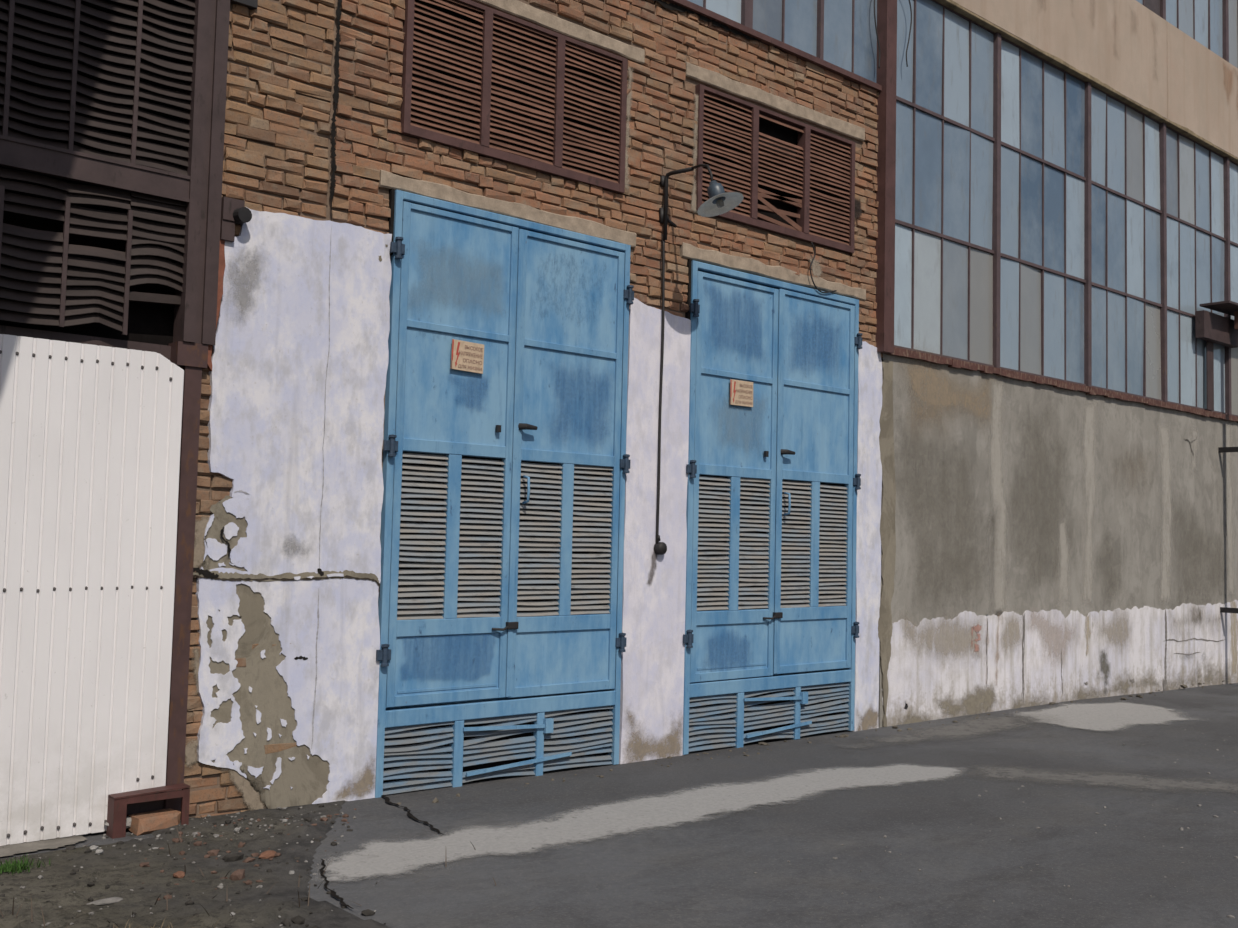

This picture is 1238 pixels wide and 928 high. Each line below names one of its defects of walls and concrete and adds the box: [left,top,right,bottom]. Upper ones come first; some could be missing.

damp [908,363,1068,611]
damp [1083,405,1110,601]
damp [1159,426,1234,600]
peeling [185,495,330,810]
peeling [1003,612,1072,660]
peeling [1103,618,1129,647]